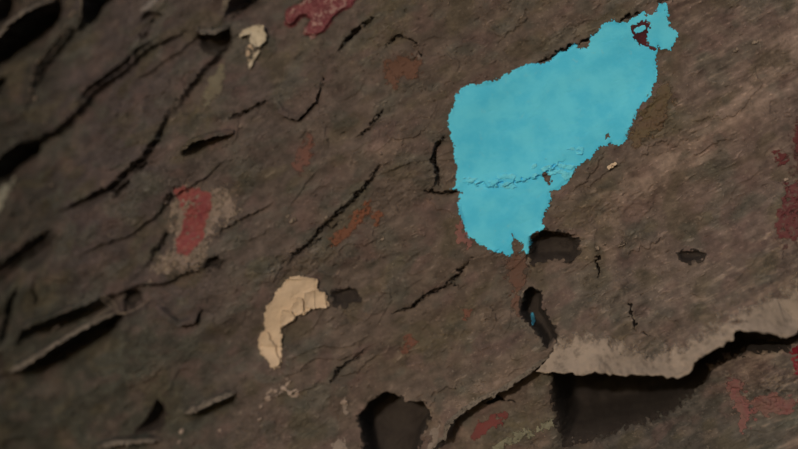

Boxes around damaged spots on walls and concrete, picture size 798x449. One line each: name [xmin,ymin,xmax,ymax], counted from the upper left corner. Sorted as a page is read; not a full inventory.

crack [84,19,155,97]
peeling [195,0,268,69]
crack [62,99,180,213]
crack [0,230,52,268]
peeling [0,287,142,375]
crack [144,230,169,268]
peeling [258,275,362,369]
crack [396,257,473,313]
spalling [525,227,581,267]
spalling [355,274,798,449]